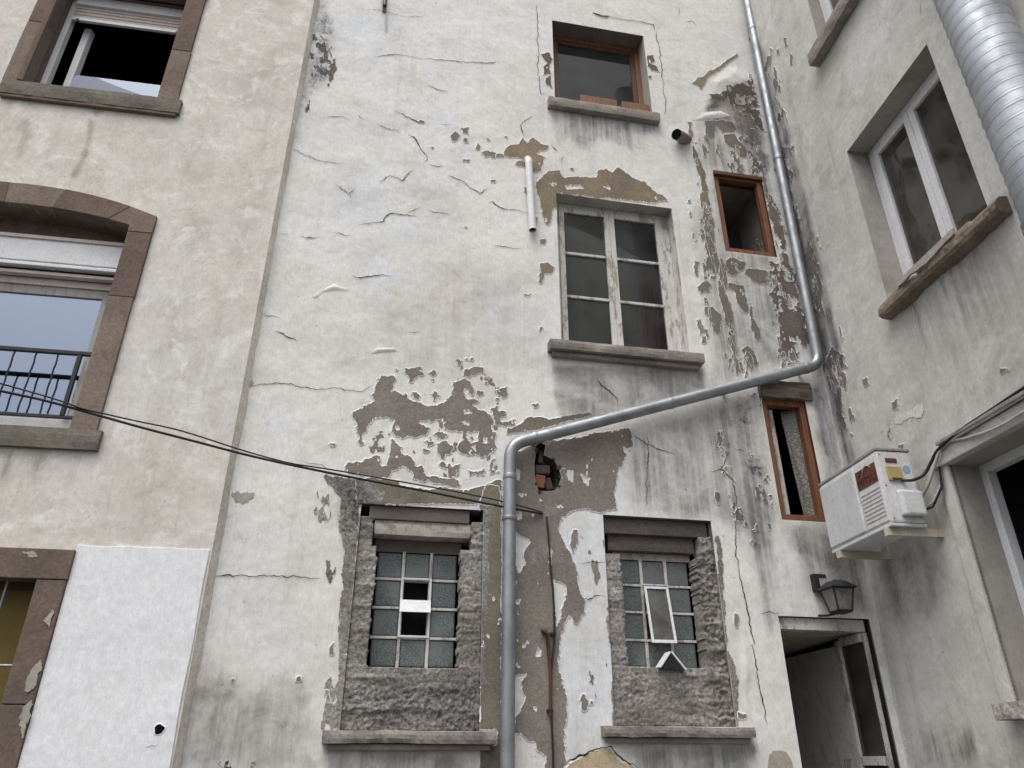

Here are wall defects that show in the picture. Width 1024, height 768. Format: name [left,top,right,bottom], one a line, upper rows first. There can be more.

peeling [310,34,338,87]
crack [378,54,495,63]
crack [324,110,526,213]
peeling [449,127,668,246]
peeling [687,47,826,378]
peeling [523,262,556,298]
crack [255,382,370,392]
crack [633,431,676,506]
crack [221,572,320,580]
peeling [313,357,636,768]
crack [710,449,773,722]
spalling [153,722,167,736]